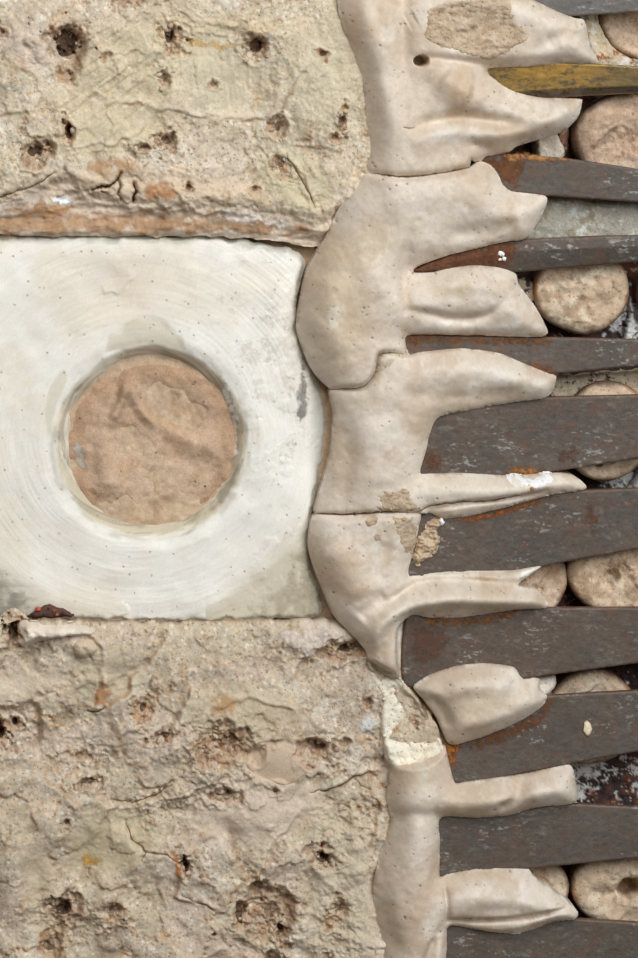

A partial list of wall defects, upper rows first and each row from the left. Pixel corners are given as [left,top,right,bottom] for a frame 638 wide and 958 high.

spalling [424,0,529,60]
corrosion [414,242,515,272]
spalling [365,489,427,559]
corrosion [445,701,551,764]
crack [110,785,181,863]